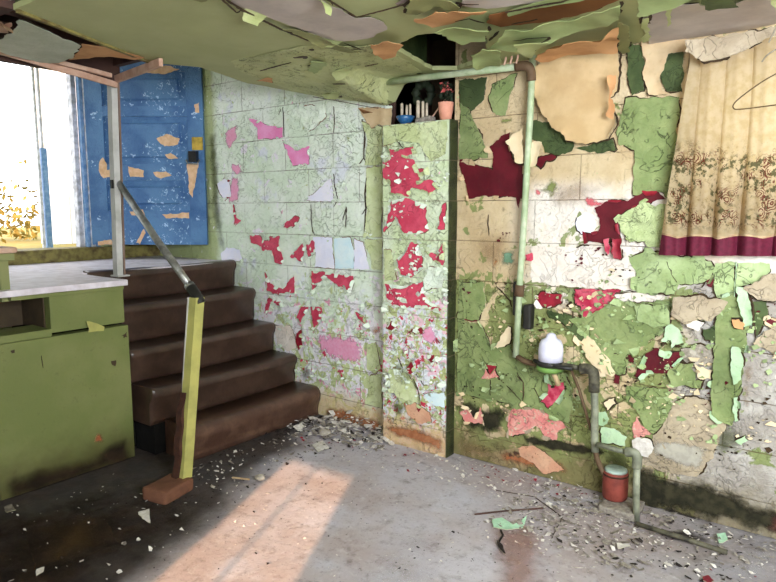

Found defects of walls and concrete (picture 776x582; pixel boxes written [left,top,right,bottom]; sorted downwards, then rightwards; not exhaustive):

peeling [0,0,144,67]
peeling [99,158,110,178]
peeling [128,167,171,178]
peeling [157,134,180,159]
peeling [187,164,199,198]
peeling [217,0,776,484]
water stain [12,442,128,495]
water stain [630,469,776,529]